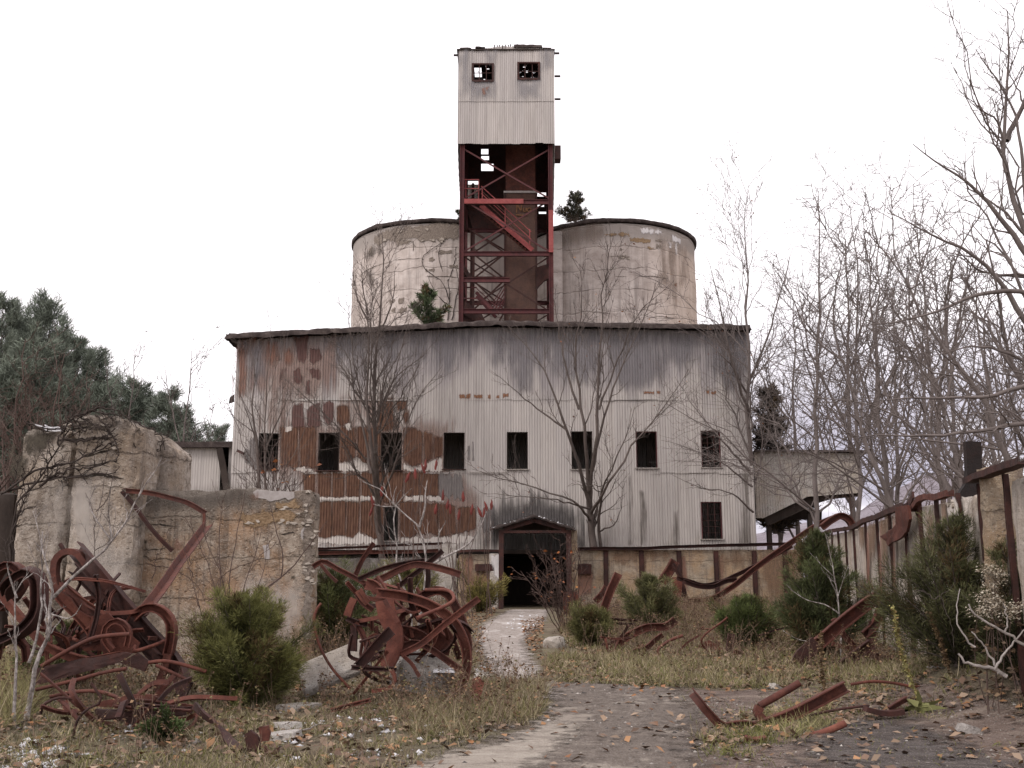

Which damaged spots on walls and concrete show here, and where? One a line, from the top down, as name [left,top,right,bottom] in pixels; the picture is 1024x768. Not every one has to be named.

spalling [605,232,662,260]
water stain [641,228,681,254]
water stain [494,329,691,388]
rust [232,335,494,540]
peeling [339,457,369,472]
spalling [240,490,378,640]
peeling [400,534,473,544]
water stain [763,548,801,600]